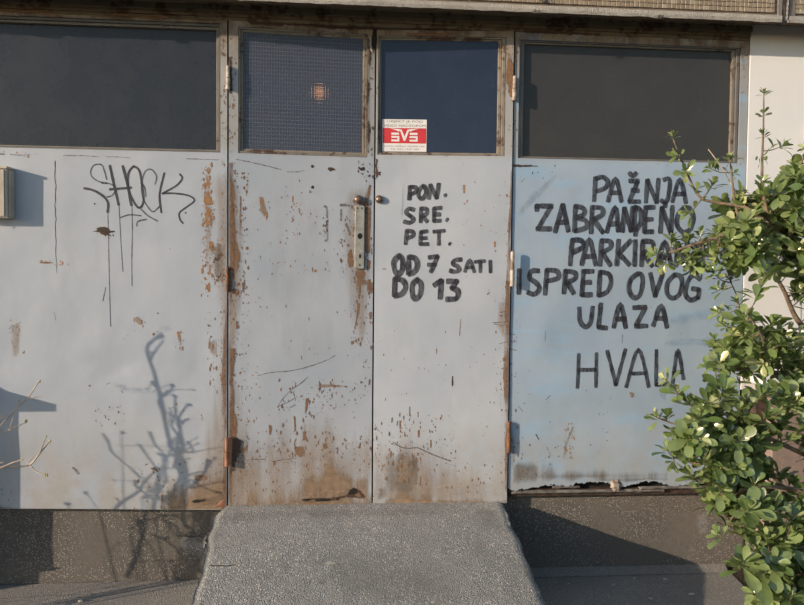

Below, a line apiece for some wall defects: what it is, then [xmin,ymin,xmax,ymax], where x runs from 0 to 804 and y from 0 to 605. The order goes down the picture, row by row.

corrosion [490,164,535,262]
corrosion [137,158,490,509]
corrosion [484,273,553,492]